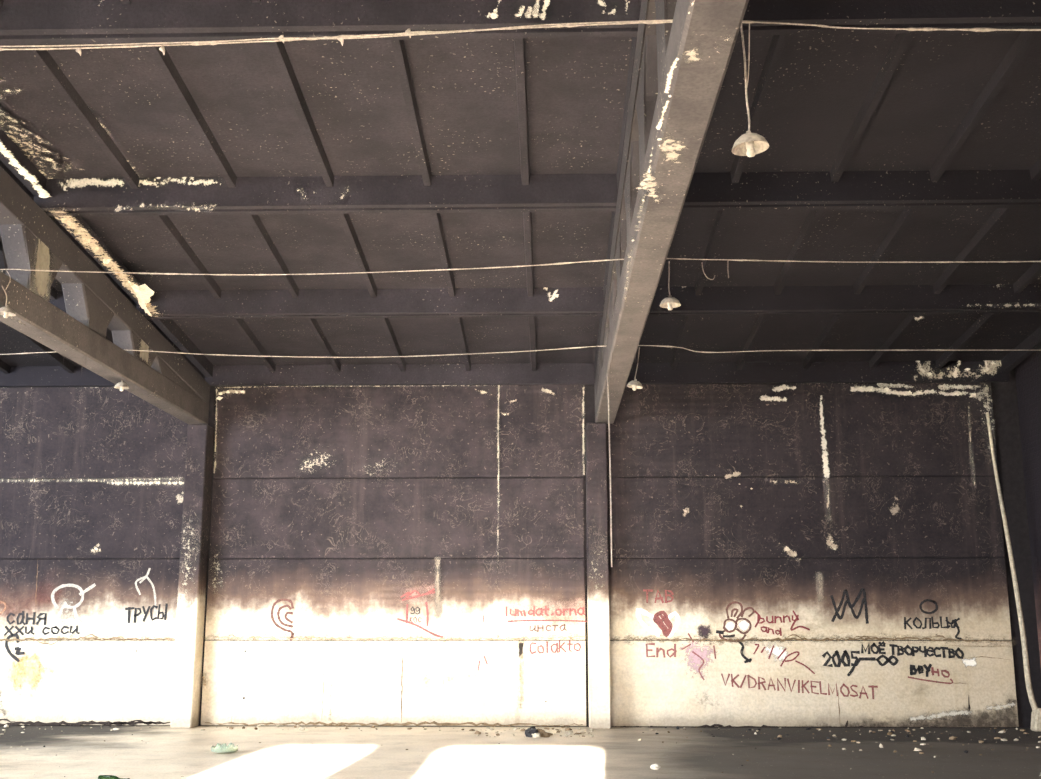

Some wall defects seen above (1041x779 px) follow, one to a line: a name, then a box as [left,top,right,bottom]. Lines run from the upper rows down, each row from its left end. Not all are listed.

damp [0,113,124,198]
damp [127,160,221,187]
peeling [636,49,700,217]
damp [32,238,51,302]
spalling [759,383,797,402]
spalling [850,383,980,399]
damp [819,395,830,478]